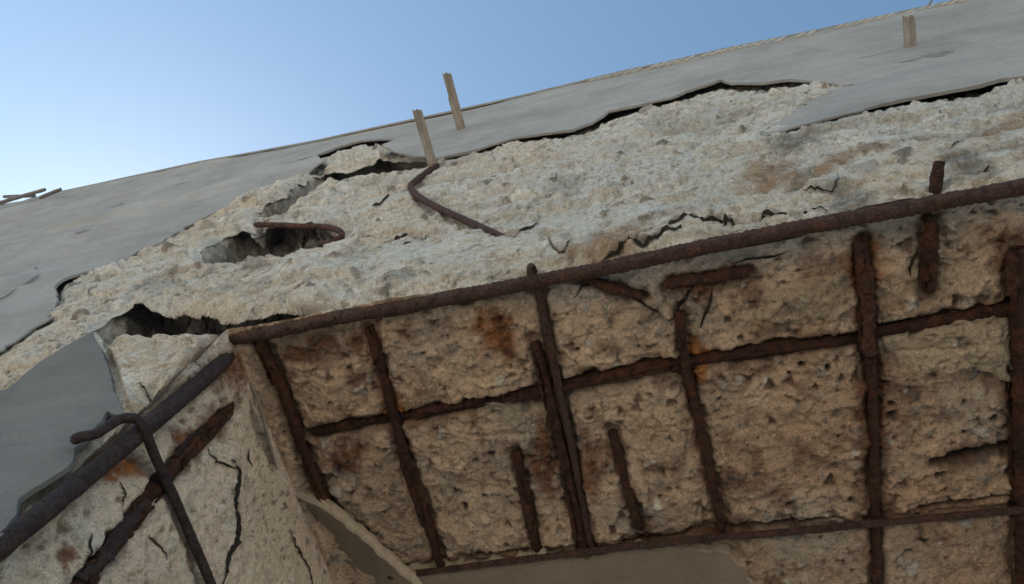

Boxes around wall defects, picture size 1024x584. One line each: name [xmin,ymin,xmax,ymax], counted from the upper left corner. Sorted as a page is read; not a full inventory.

crack [602,171,839,261]
corrosion [958,186,1024,203]
spalling [0,442,156,584]
corrosion [58,405,234,584]
crack [208,448,253,584]
corrosion [283,312,379,366]
corrosion [383,390,484,425]
spalling [91,289,872,584]
spalling [0,78,1024,537]
corrosion [504,352,602,544]
corrosion [613,311,713,419]
spalling [875,316,1016,584]